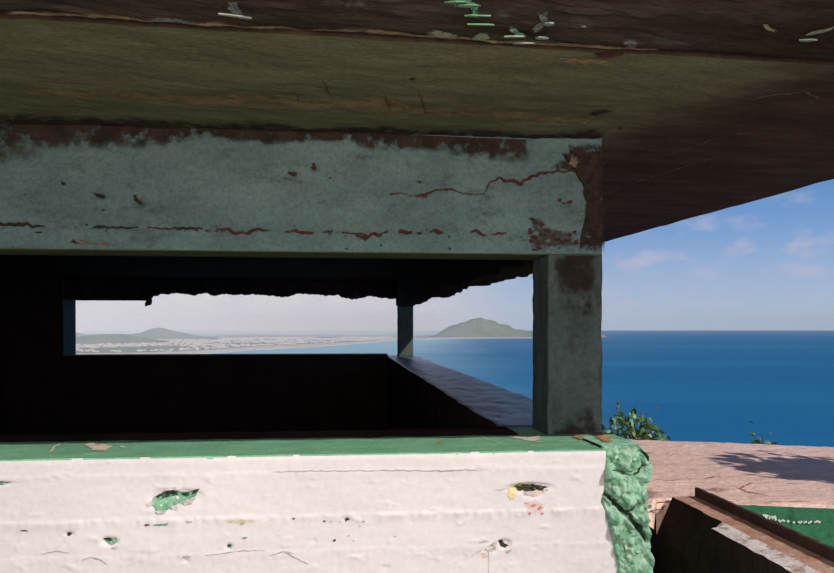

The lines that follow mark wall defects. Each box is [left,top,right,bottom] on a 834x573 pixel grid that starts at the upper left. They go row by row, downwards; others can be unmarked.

peeling [12,2,291,29]
peeling [315,0,657,50]
peeling [799,27,834,42]
damp [0,115,601,159]
crack [390,162,582,197]
spalling [147,487,199,514]
spalling [495,483,549,500]